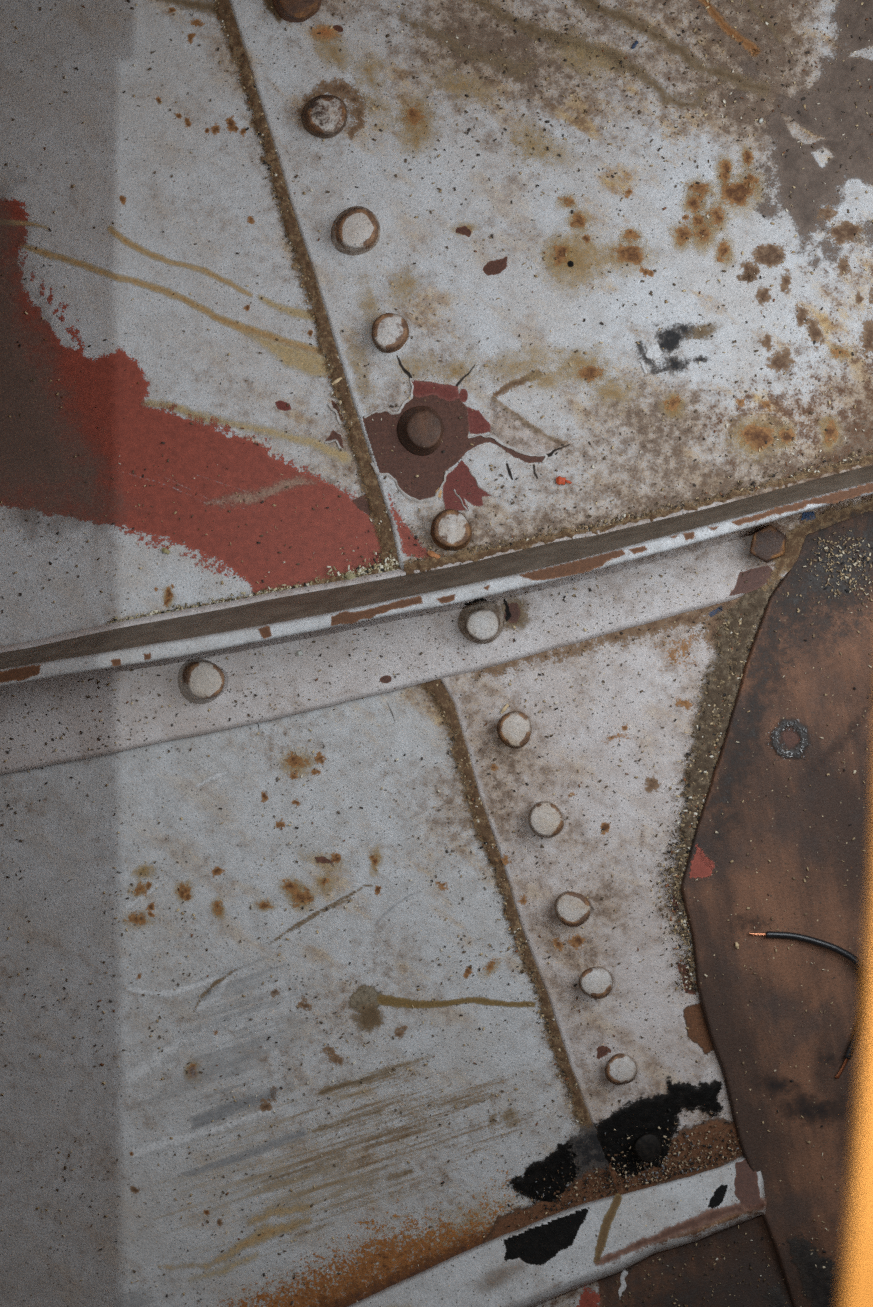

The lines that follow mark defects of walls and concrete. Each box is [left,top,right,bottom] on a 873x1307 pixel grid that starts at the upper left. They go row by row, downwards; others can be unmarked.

rust [557,196,590,243]
rust [610,229,654,277]
peeling [331,585,528,631]
peeling [258,626,272,639]
peeling [0,664,41,683]
rust [284,751,326,780]
rust [645,776,661,793]
rust [125,866,155,925]
rust [175,882,191,900]
rust [281,850,341,908]
rust [369,847,382,895]
rust [219,1116,767,1307]